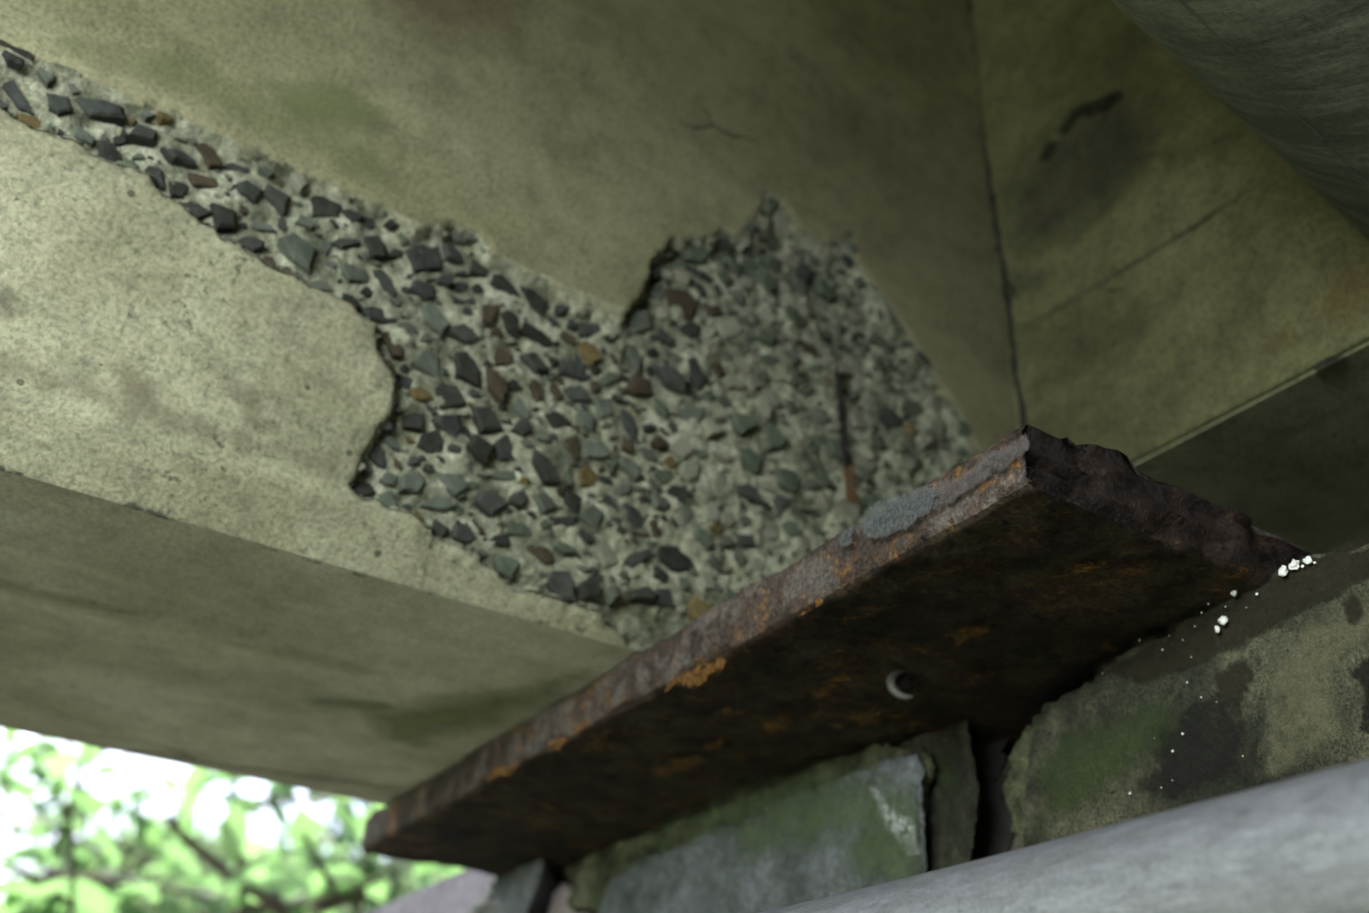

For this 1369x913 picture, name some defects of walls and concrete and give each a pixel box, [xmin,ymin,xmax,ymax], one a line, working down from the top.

spalling [0,48,1029,652]
crack [978,89,1267,428]
rust [665,658,726,691]
leakage [1103,535,1369,798]